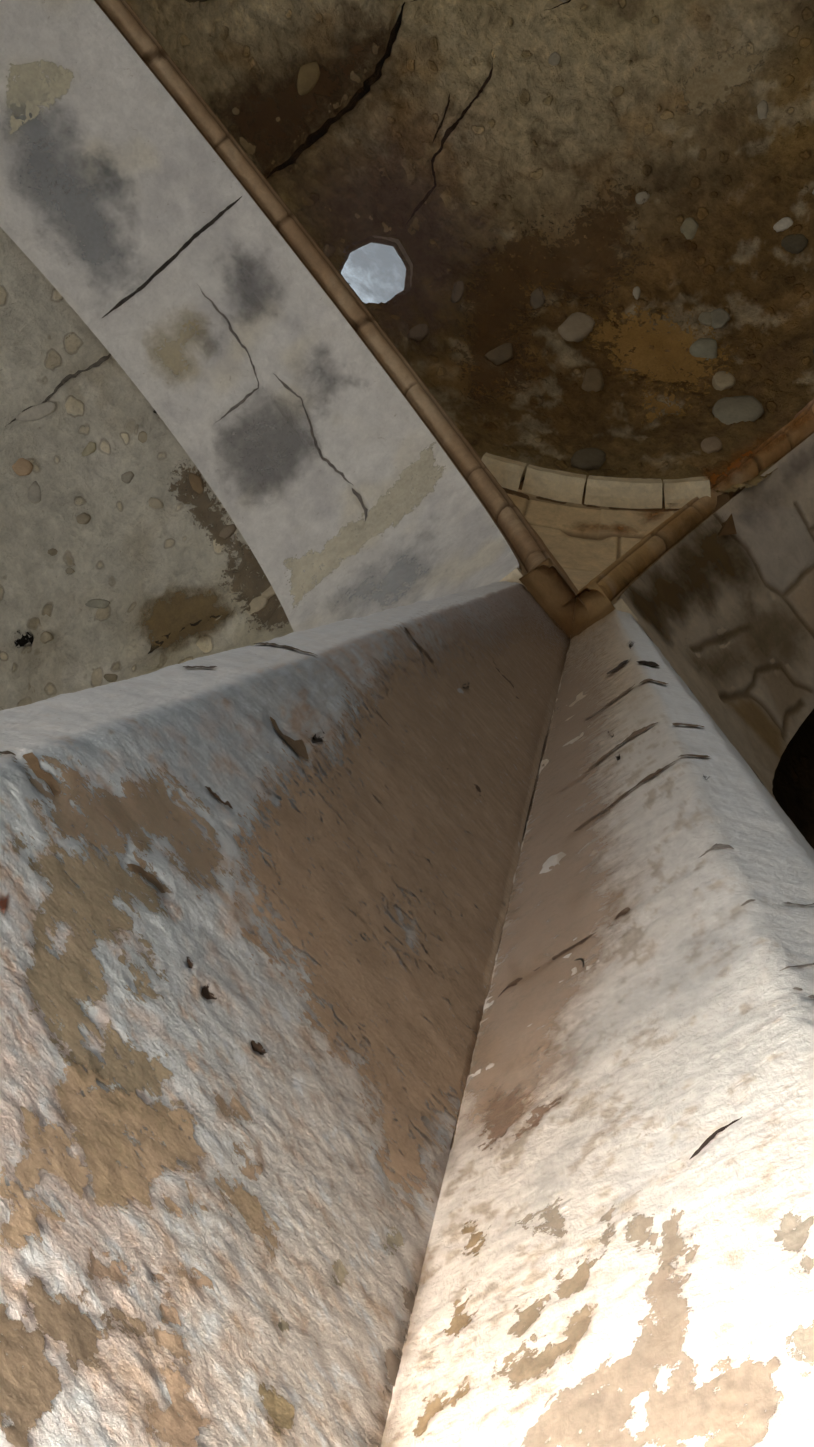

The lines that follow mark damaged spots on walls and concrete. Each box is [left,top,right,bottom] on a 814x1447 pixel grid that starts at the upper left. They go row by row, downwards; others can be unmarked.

water stain [14,113,121,266]
crack [102,0,416,318]
crack [413,54,494,215]
water stain [236,260,264,309]
crack [5,354,111,427]
water stain [224,407,314,492]
crack [199,286,368,522]
water stain [626,518,752,640]
peeling [0,752,284,1270]
peeling [0,1247,214,1447]
peeling [412,1376,470,1437]
peeling [492,1205,814,1447]